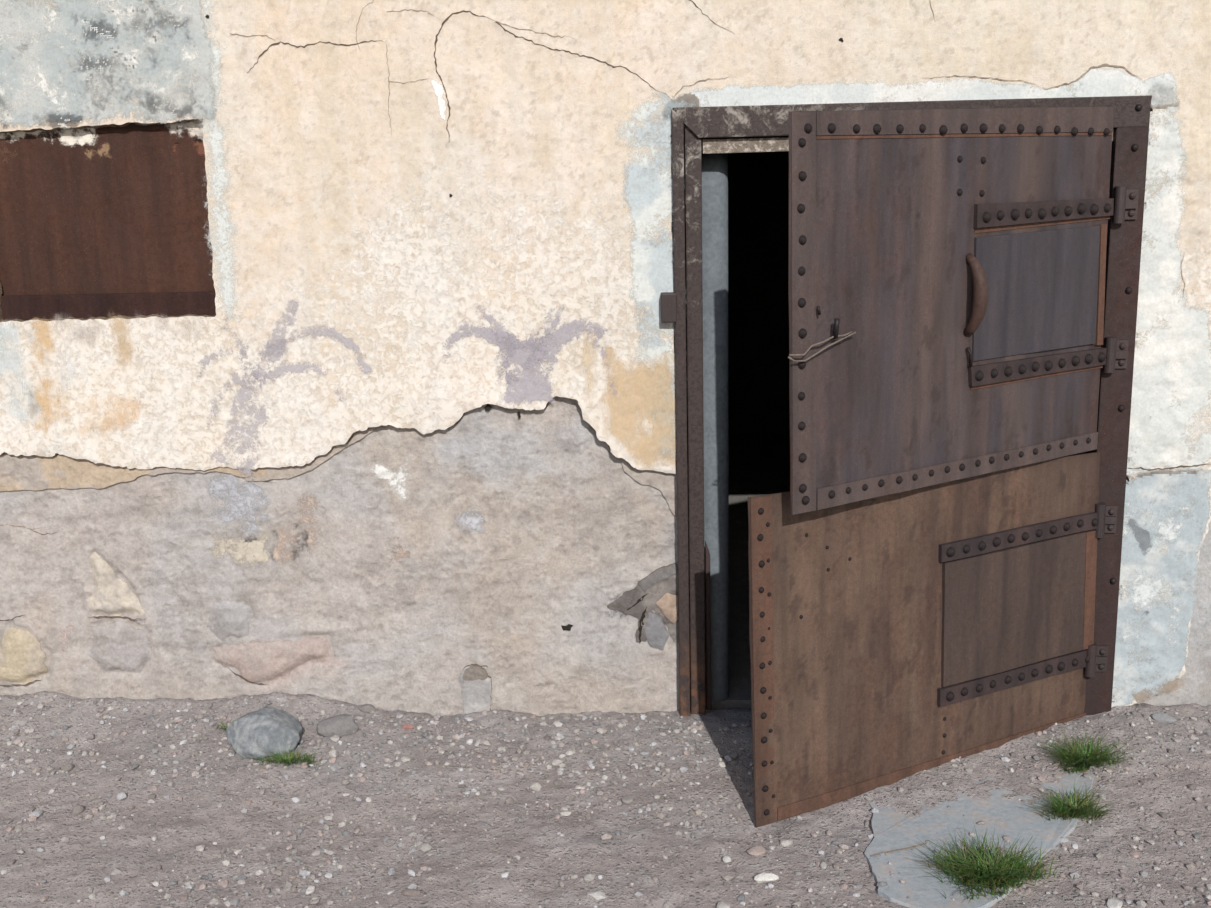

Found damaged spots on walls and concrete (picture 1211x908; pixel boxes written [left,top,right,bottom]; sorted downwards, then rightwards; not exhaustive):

peeling [0,0,203,147]
crack [230,2,670,138]
corrosion [85,143,112,159]
corrosion [193,141,205,157]
corrosion [974,216,1110,345]
spalling [0,63,1211,716]
corrosion [1083,531,1097,650]